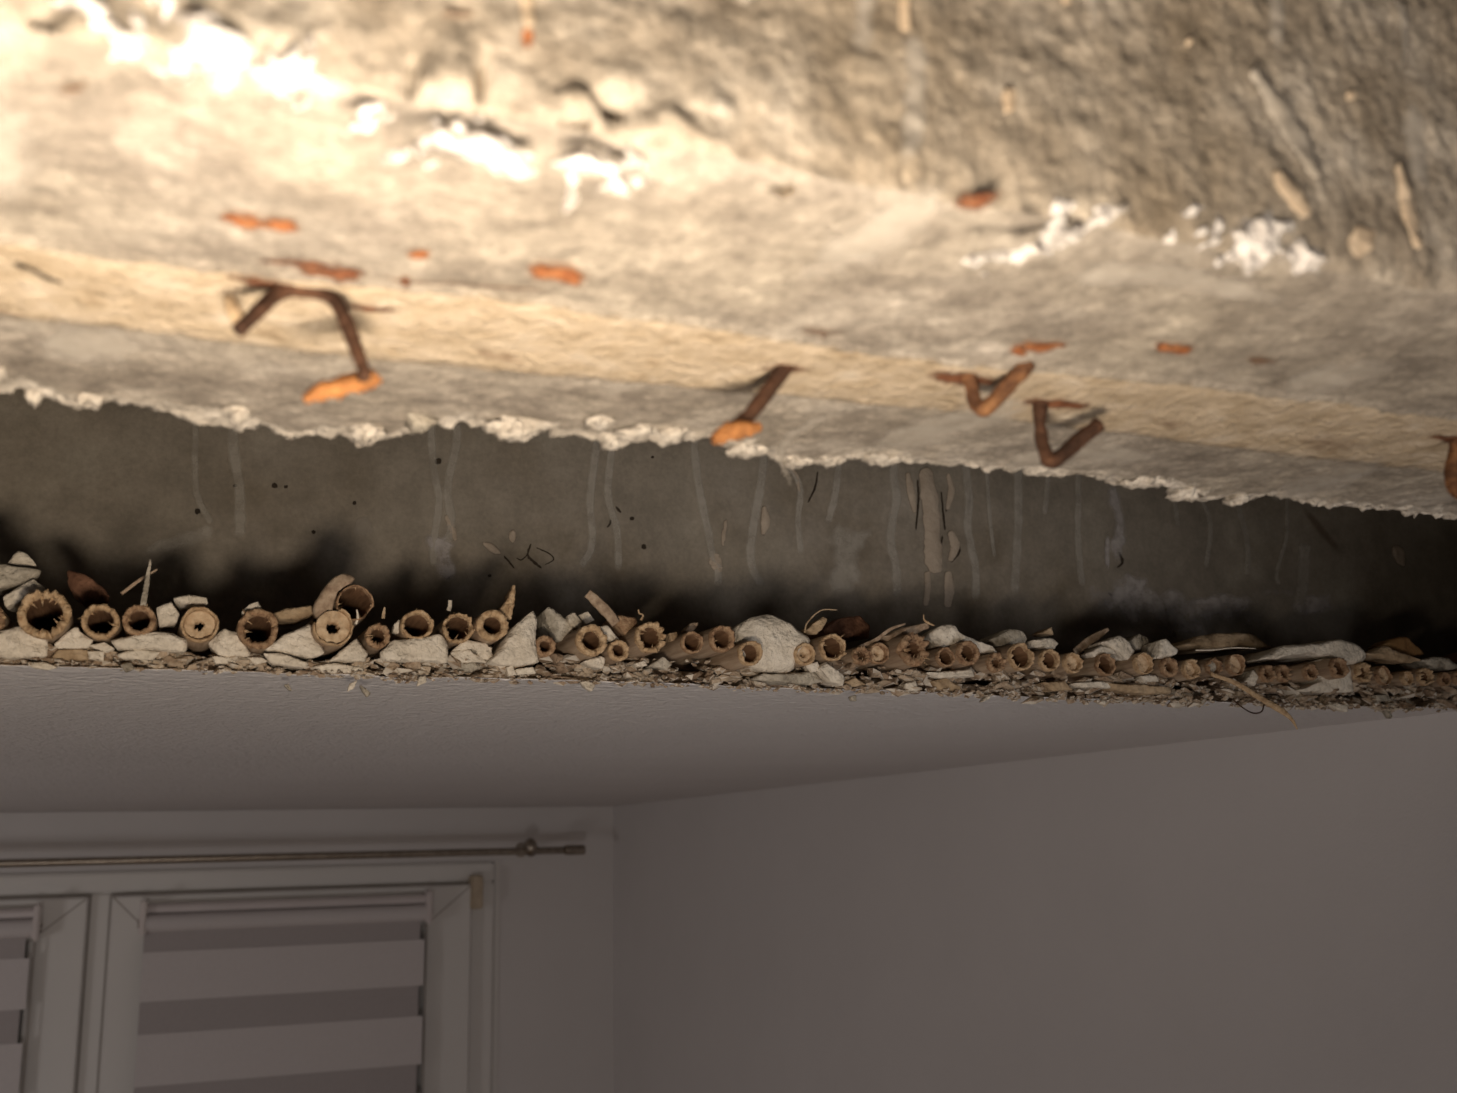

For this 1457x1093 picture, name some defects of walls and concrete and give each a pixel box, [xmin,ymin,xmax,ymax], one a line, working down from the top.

damp [51,0,349,110]
damp [345,99,396,132]
damp [381,117,649,213]
corrosion [220,213,297,232]
damp [962,198,1129,278]
damp [1083,204,1325,298]
corrosion [228,260,361,286]
corrosion [302,369,383,403]
corrosion [933,372,994,385]
corrosion [710,421,762,445]
peeling [906,467,960,608]
peeling [579,680,595,692]